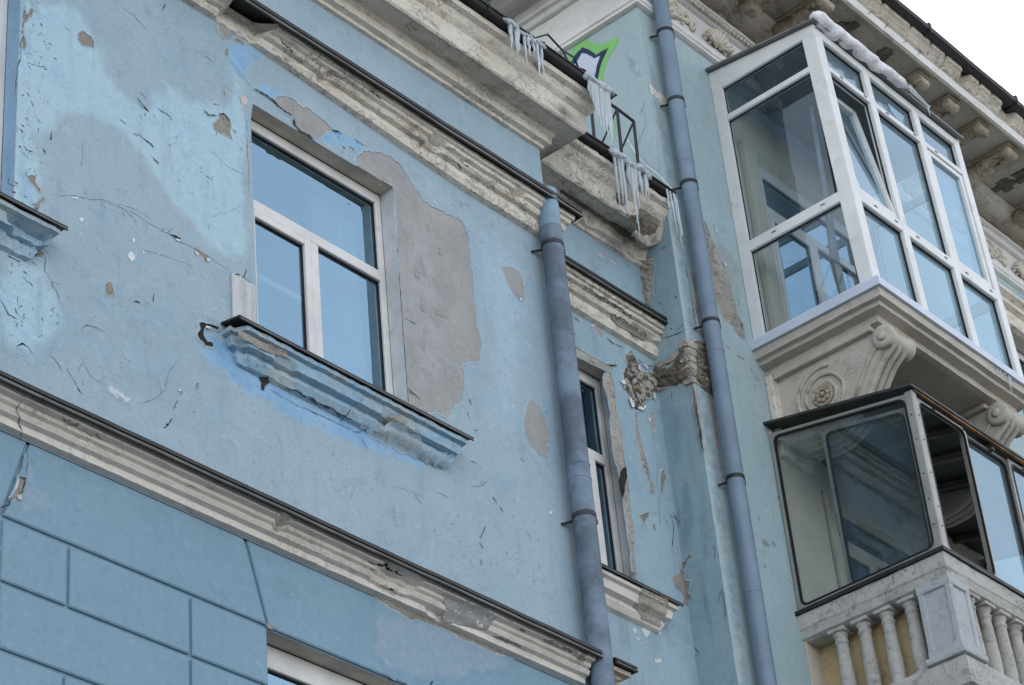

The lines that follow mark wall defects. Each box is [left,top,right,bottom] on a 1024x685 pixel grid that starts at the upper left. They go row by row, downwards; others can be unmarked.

spalling [65,27,95,48]
spalling [205,103,242,150]
crack [64,150,251,283]
spalling [237,89,483,421]
spalling [493,266,535,301]
spalling [703,219,746,341]
spalling [523,399,550,458]
spalling [574,270,724,572]
spalling [1,474,26,508]
spalling [673,552,693,606]
spalling [374,596,521,659]
spalling [631,587,669,644]